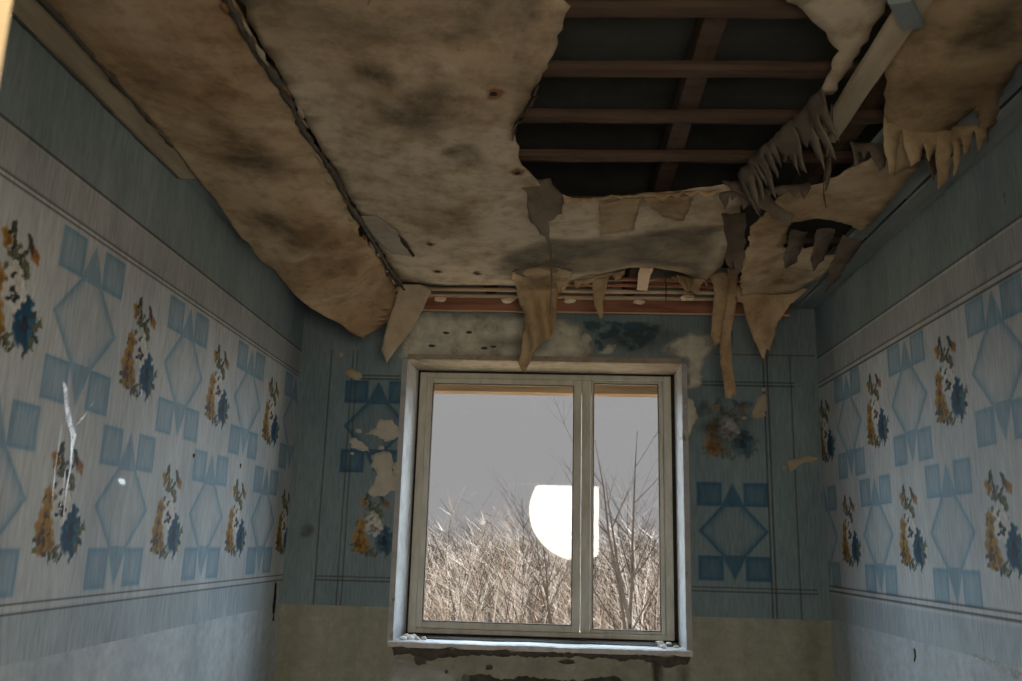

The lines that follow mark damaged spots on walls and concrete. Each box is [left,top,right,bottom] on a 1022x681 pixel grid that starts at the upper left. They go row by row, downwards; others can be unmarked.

crack [221,0,456,290]
flaking render [391,646,690,681]